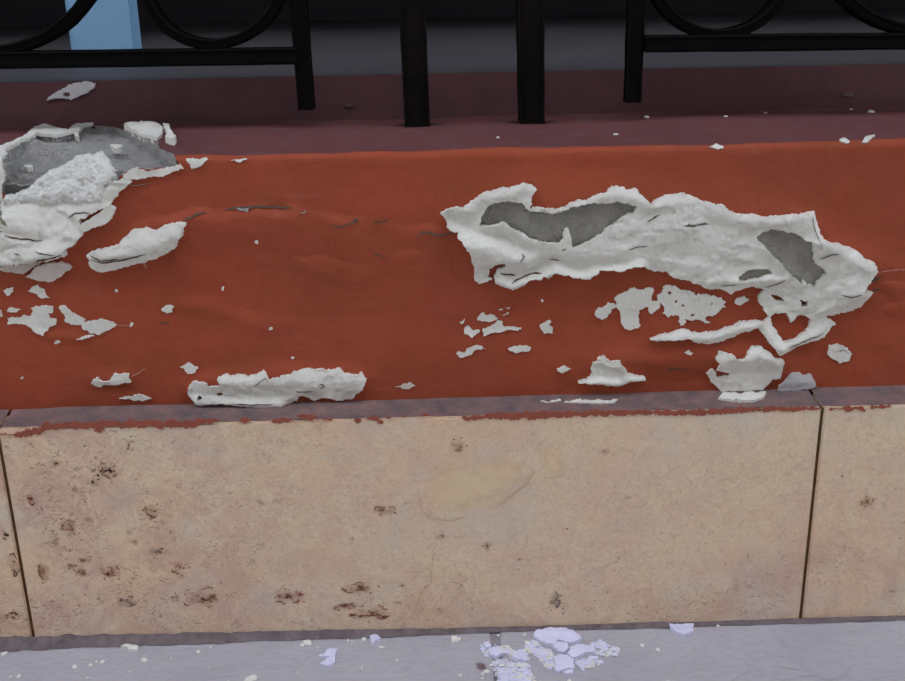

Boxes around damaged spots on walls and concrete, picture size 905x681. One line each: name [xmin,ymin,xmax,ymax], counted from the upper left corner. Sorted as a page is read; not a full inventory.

flaking render [0,120,208,340]
peeling [181,362,367,408]
flaking render [440,182,878,392]